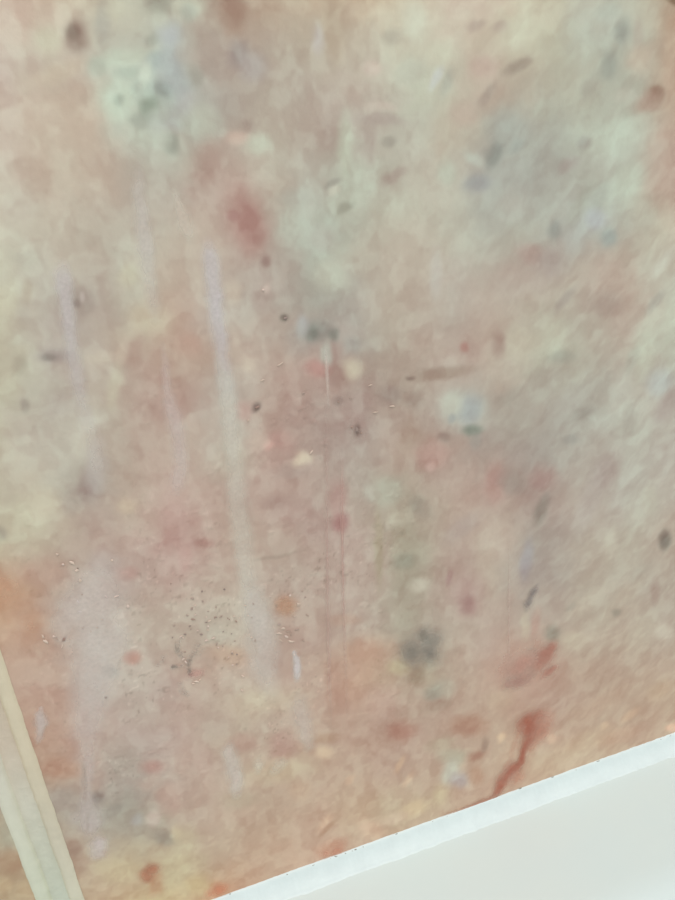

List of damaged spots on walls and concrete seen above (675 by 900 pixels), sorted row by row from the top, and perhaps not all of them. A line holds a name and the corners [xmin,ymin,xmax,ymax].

corrosion [458,711,548,811]